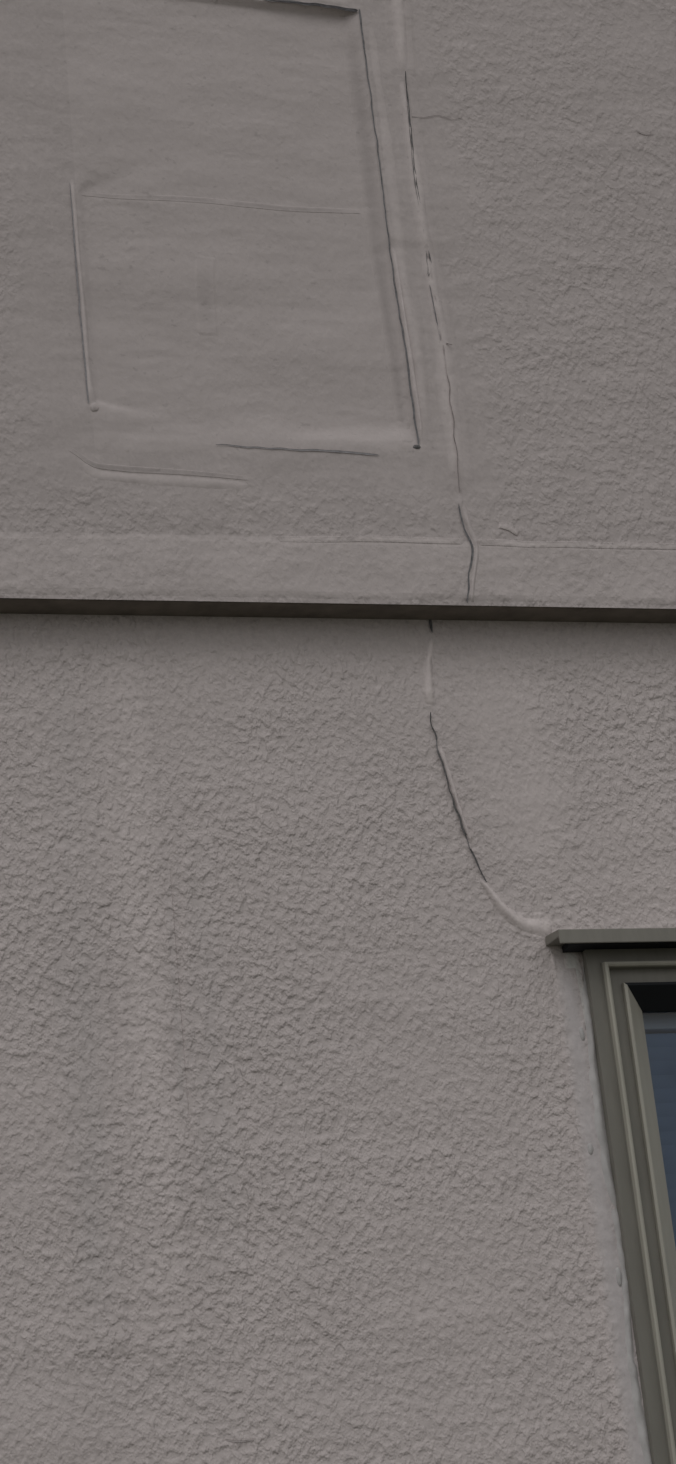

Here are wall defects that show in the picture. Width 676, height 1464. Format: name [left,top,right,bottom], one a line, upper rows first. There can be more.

crack [69,182,89,403]
crack [267,0,419,445]
crack [68,444,378,480]
crack [458,505,479,603]
crack [422,619,552,937]